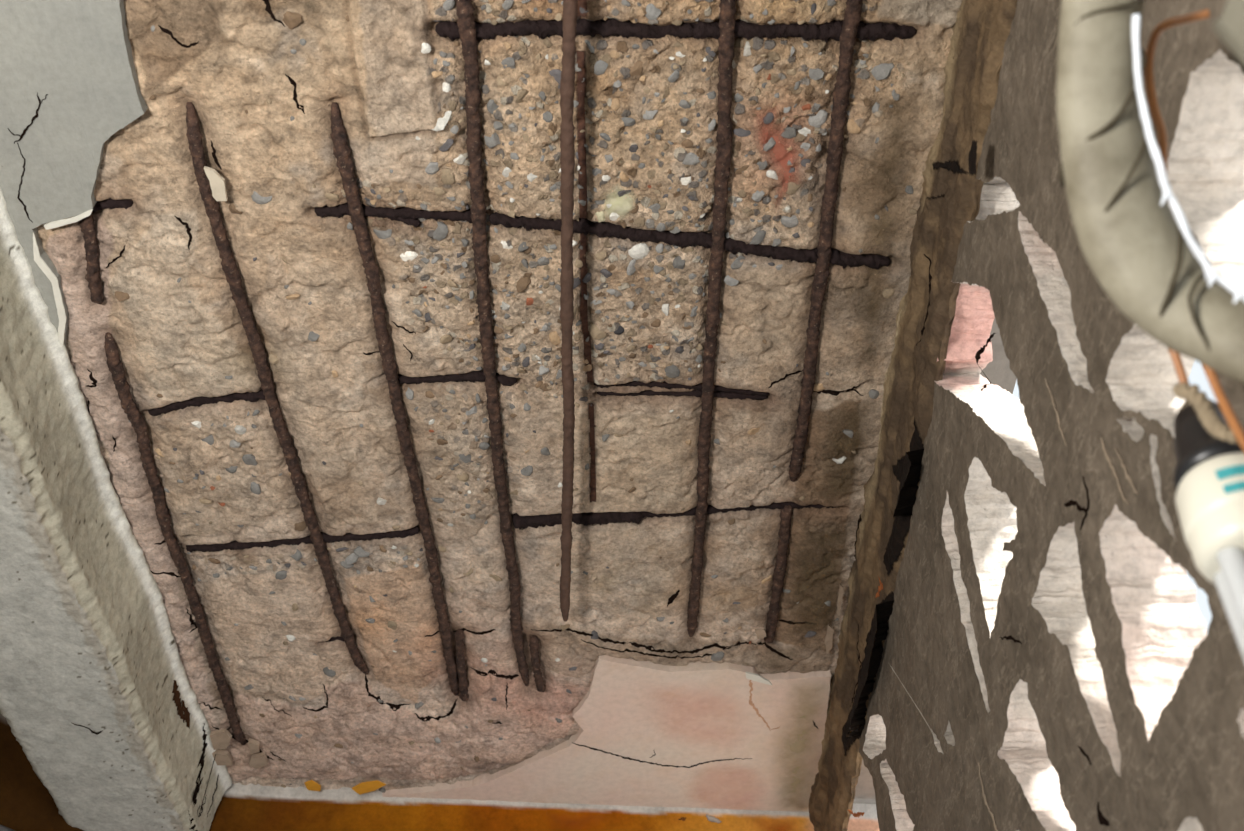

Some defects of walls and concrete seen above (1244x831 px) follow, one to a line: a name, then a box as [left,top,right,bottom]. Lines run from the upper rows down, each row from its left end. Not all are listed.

crack [8,93,48,223]
corrosion [761,128,795,191]
corrosion [576,50,594,383]
spalling [33,0,963,793]
corrosion [588,403,596,502]
crack [531,620,812,660]
crack [749,680,780,730]
crack [572,742,752,768]